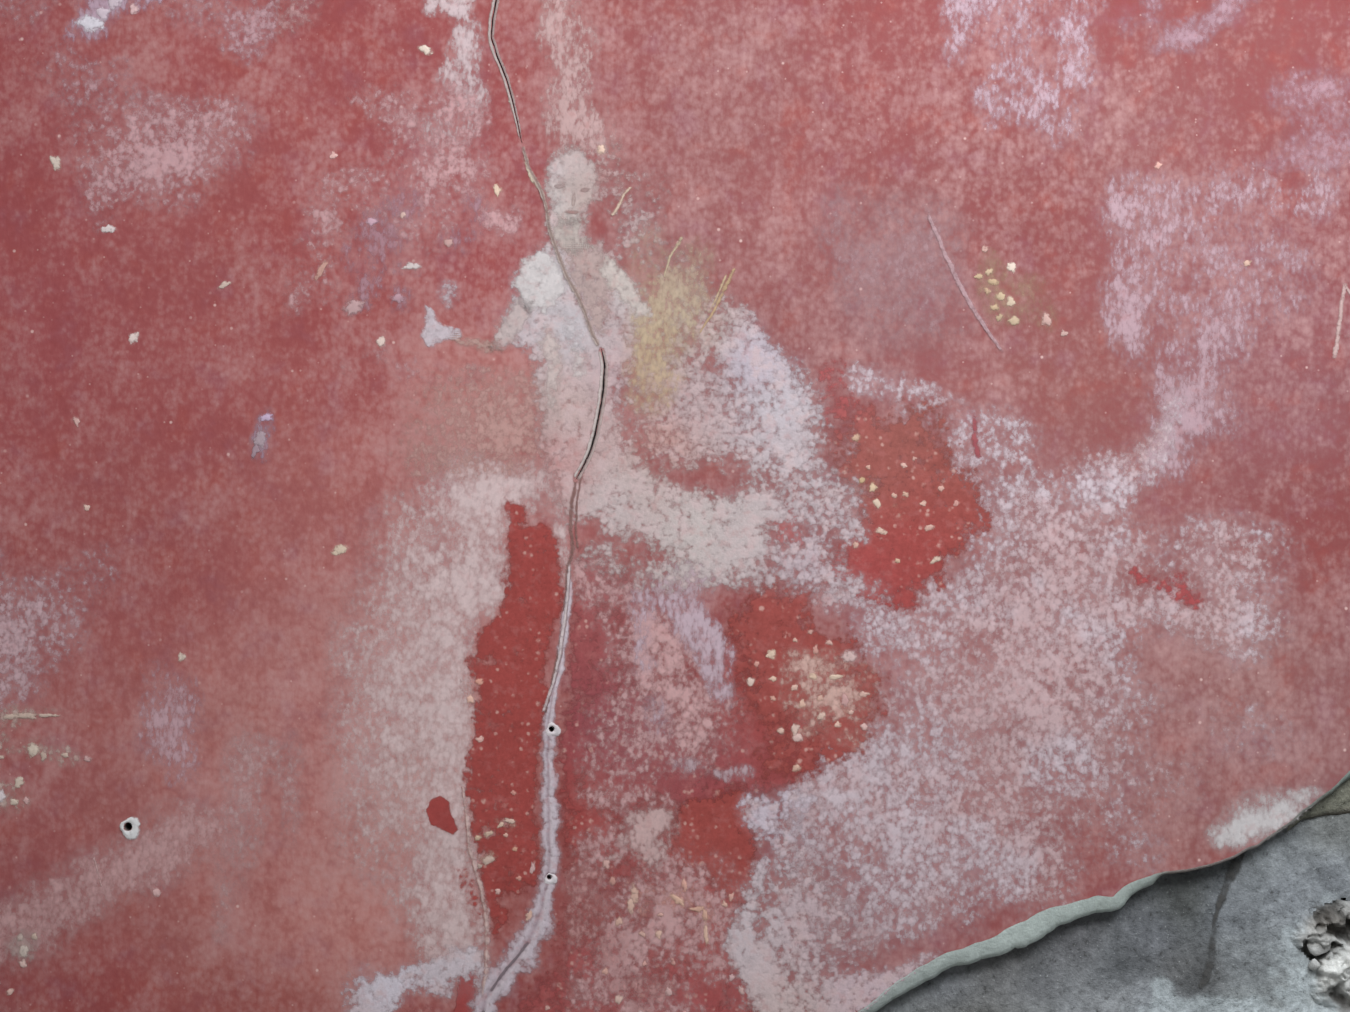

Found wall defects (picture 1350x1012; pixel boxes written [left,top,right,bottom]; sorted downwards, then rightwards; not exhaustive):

leakage [344,191,420,314]
leakage [1100,73,1350,485]
crack [462,0,608,1012]
leakage [632,560,734,701]
flaking render [426,361,1350,1012]
leakage [609,808,674,867]
leakage [714,765,753,782]
leakage [1209,788,1317,848]